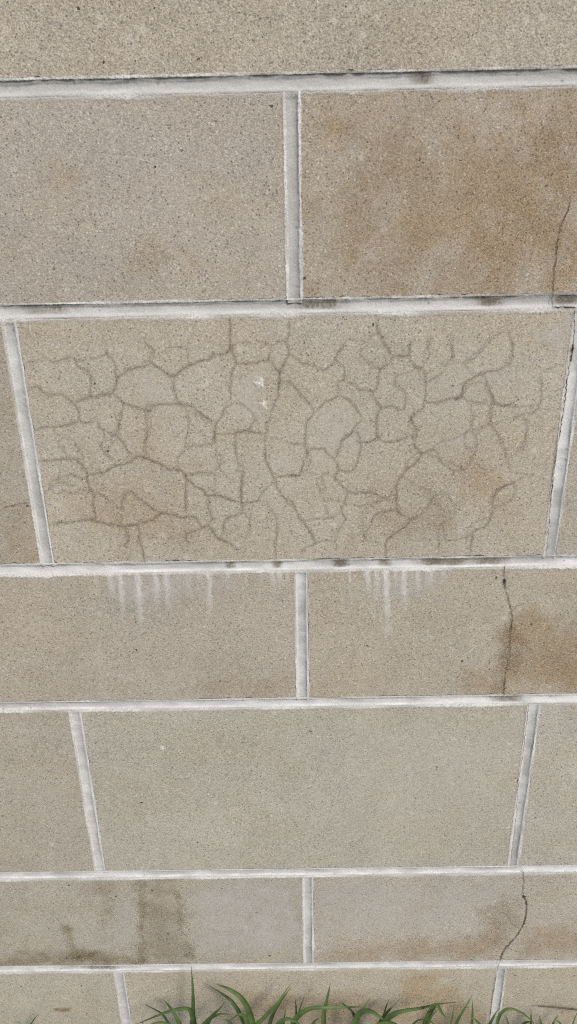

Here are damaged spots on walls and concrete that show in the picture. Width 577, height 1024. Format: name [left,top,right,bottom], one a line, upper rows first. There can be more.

crack [503,567,513,641]